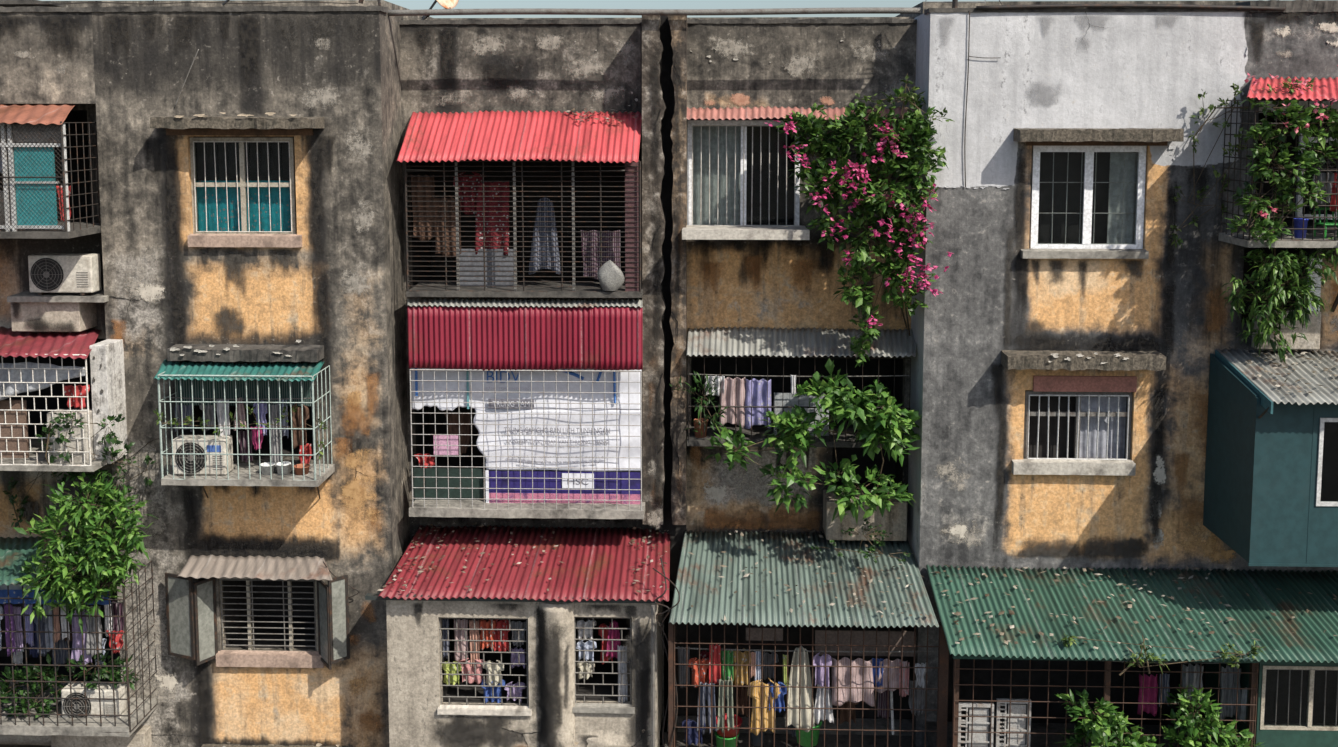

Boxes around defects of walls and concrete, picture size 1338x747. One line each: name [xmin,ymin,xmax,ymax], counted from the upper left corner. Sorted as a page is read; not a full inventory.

damp [220,16,259,80]
damp [216,307,244,335]
damp [224,250,245,291]
damp [270,249,290,269]
crack [651,15,682,536]
damp [730,238,836,270]
damp [1004,159,1174,352]
damp [1166,168,1208,267]
damp [992,365,1007,524]
damp [1019,385,1167,558]
damp [414,604,422,622]
damp [438,608,569,747]